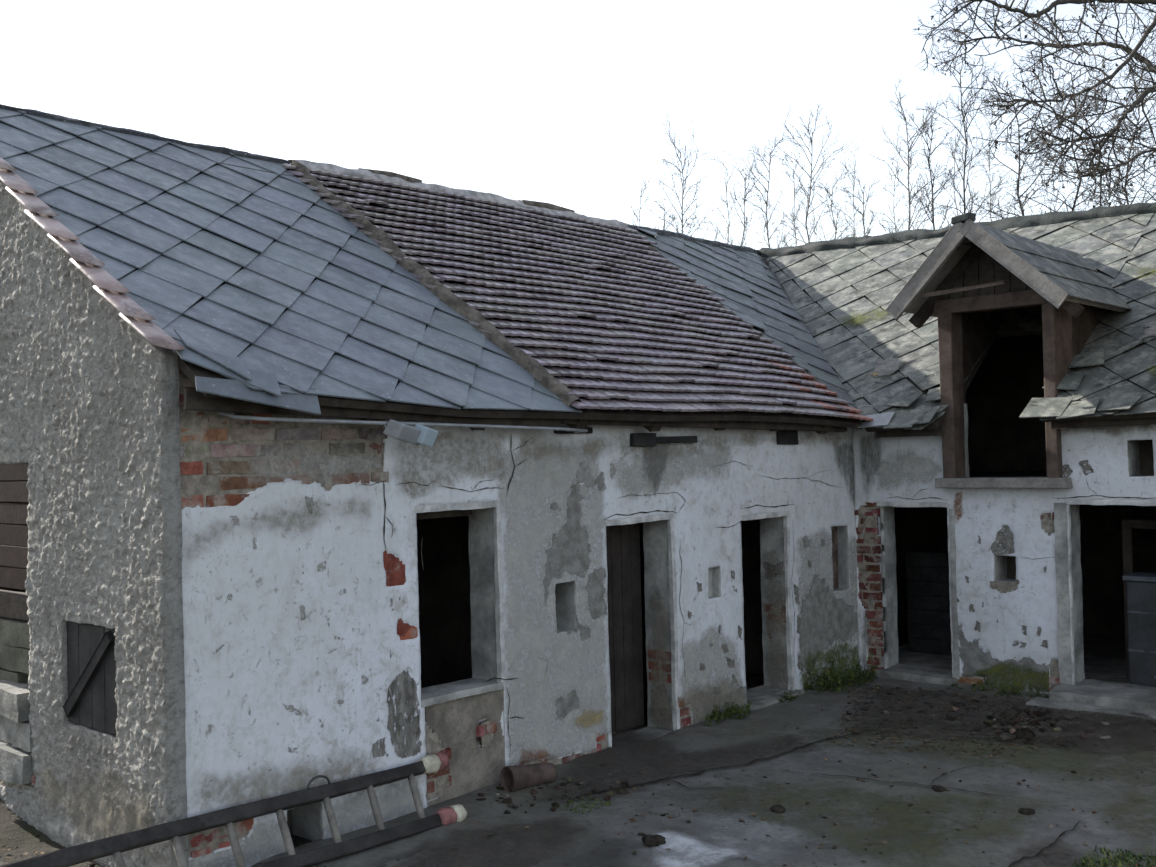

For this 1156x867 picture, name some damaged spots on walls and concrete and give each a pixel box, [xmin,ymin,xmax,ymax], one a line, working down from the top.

flaking render [179,369,389,525]
flaking render [383,551,418,640]
crack [360,425,533,551]
crack [713,461,836,679]
flaking render [763,502,884,689]
spalling [978,525,1015,556]
spalling [990,579,1032,593]
flaking render [1040,512,1055,536]
peeling [323,670,452,835]
damp [550,726,815,799]